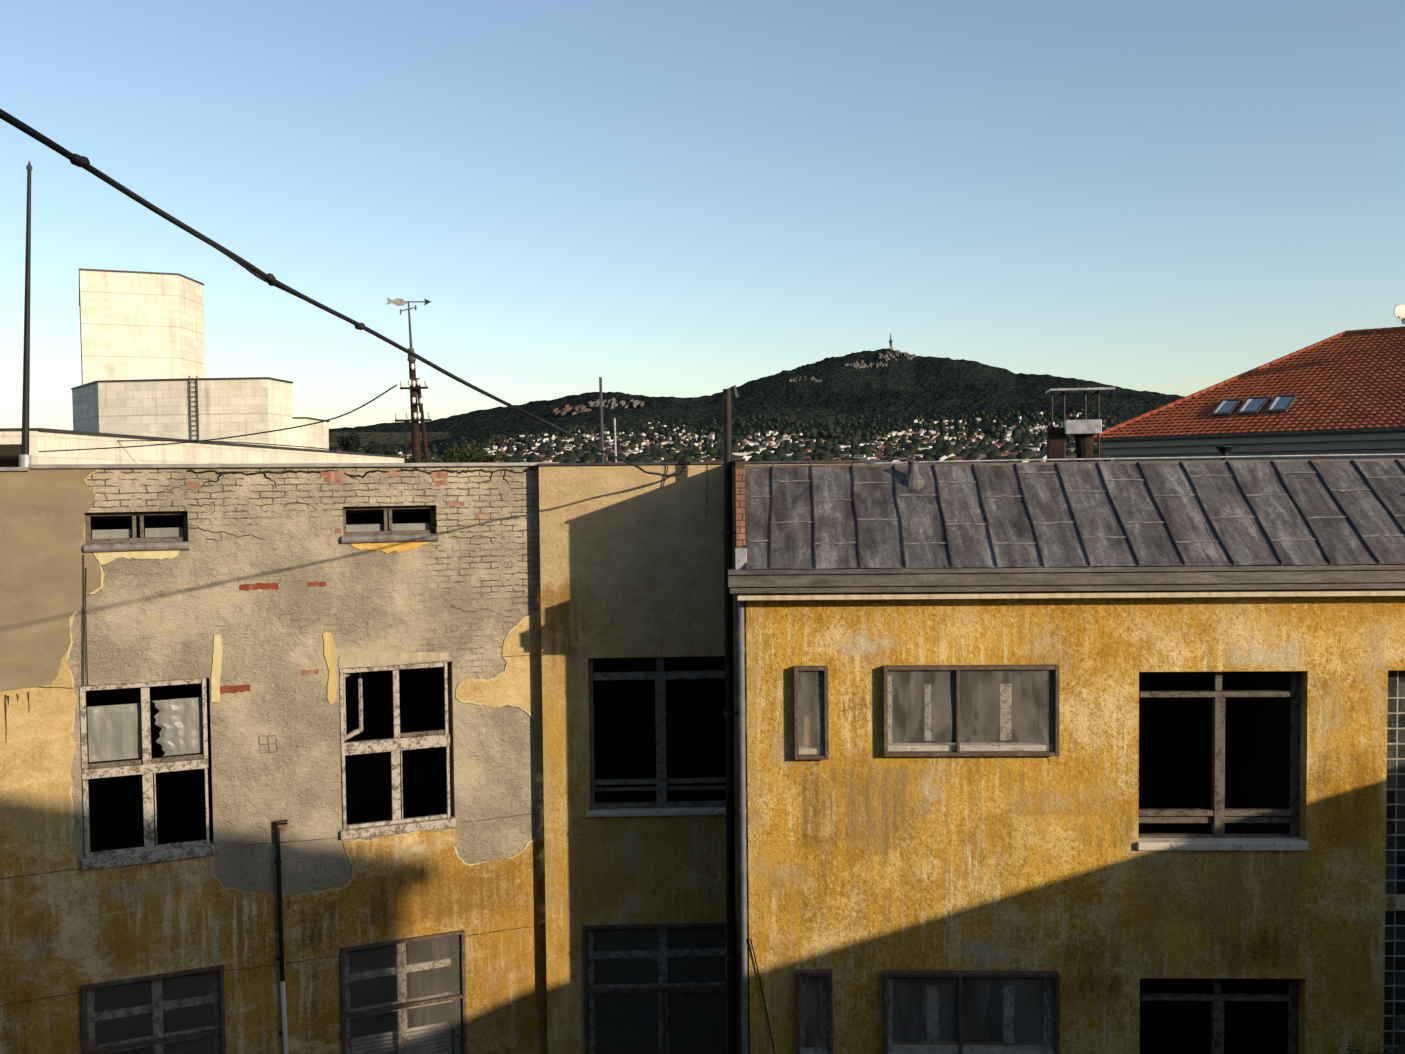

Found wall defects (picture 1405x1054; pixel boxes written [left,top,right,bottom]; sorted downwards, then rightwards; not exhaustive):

damp [4,692,30,743]
flaking render [66,466,544,896]
damp [370,845,515,925]